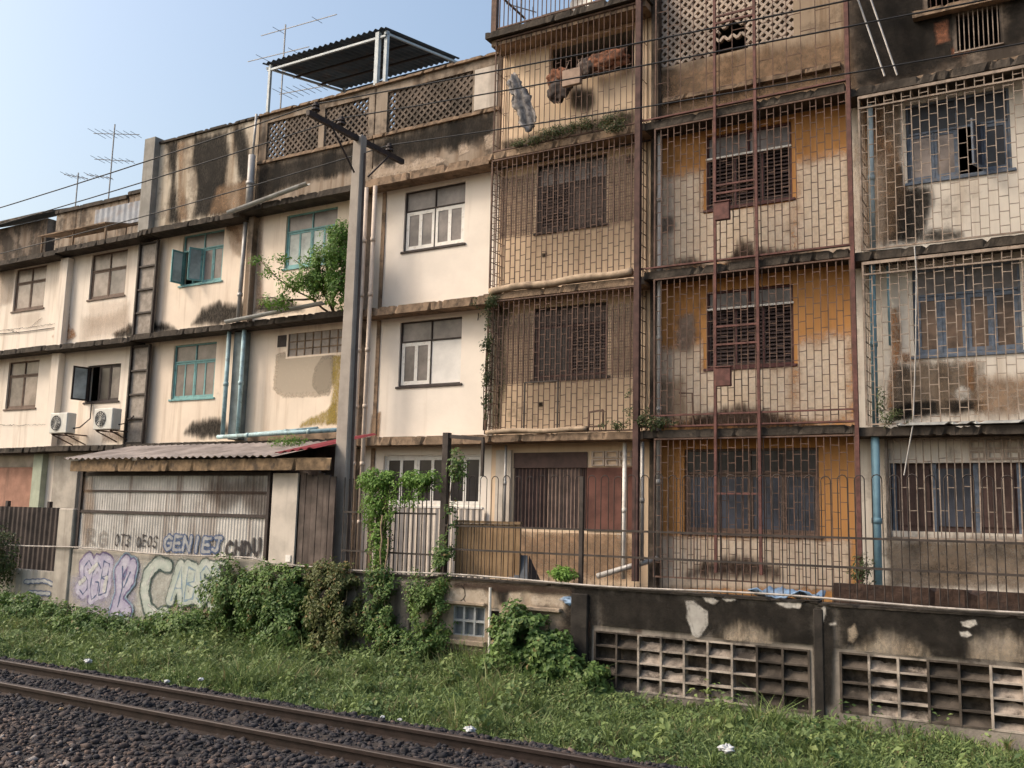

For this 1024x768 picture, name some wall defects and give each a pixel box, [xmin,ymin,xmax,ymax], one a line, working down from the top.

leakage [167,126,353,223]
leakage [861,106,960,244]
leakage [195,301,243,325]
leakage [185,419,228,438]
flaking render [686,598,733,638]
flaking render [960,620,976,637]